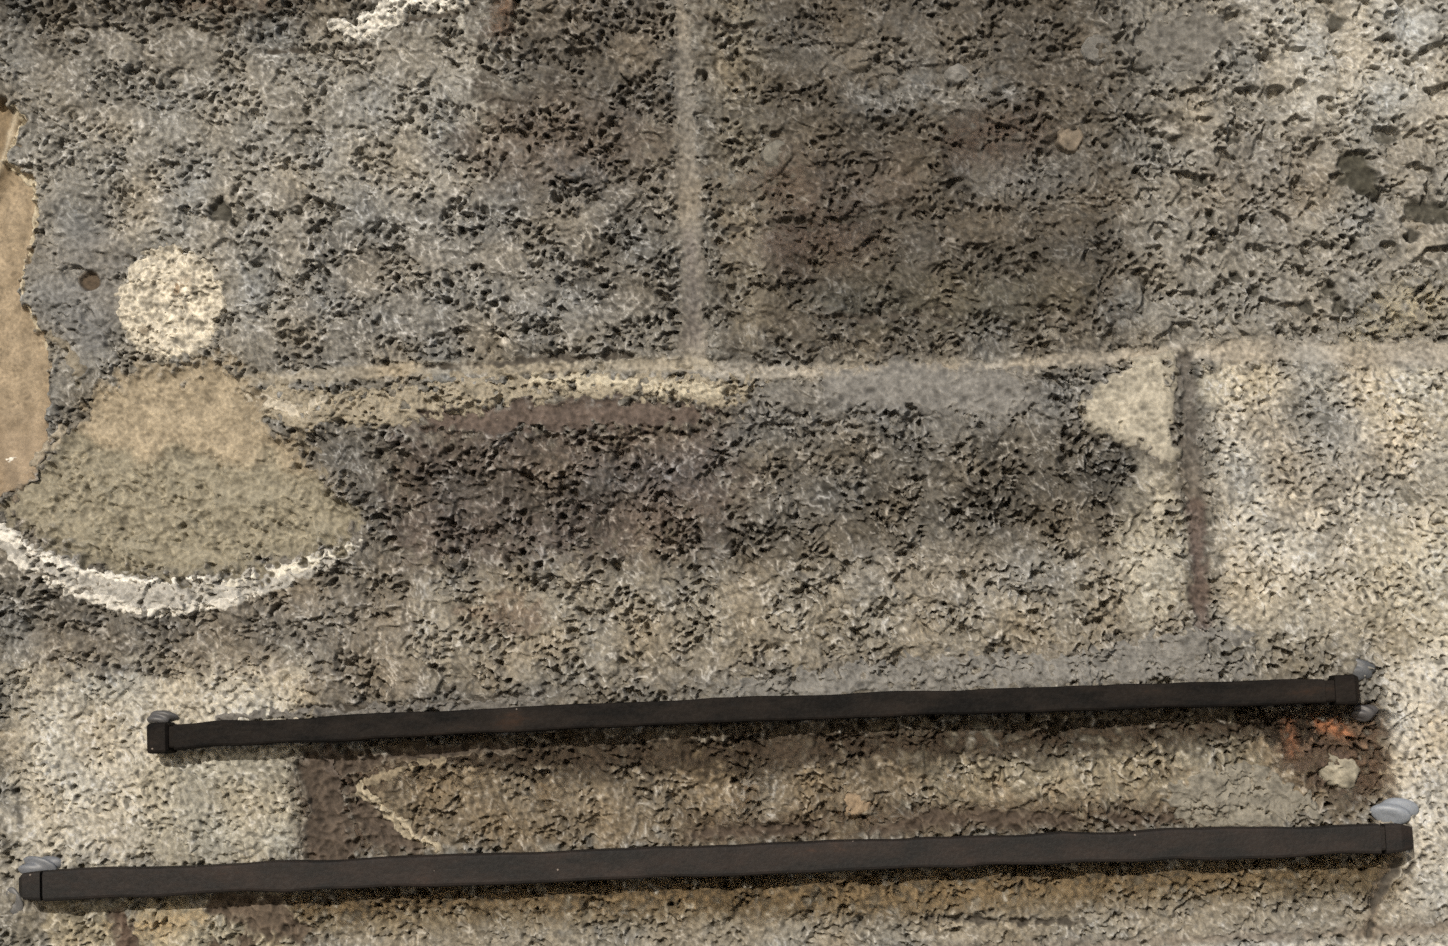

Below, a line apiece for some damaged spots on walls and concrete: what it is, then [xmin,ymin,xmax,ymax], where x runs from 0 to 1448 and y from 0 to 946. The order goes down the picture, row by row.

spalling [0,93,367,593]
water stain [0,523,363,619]
corrosion [339,709,1379,846]